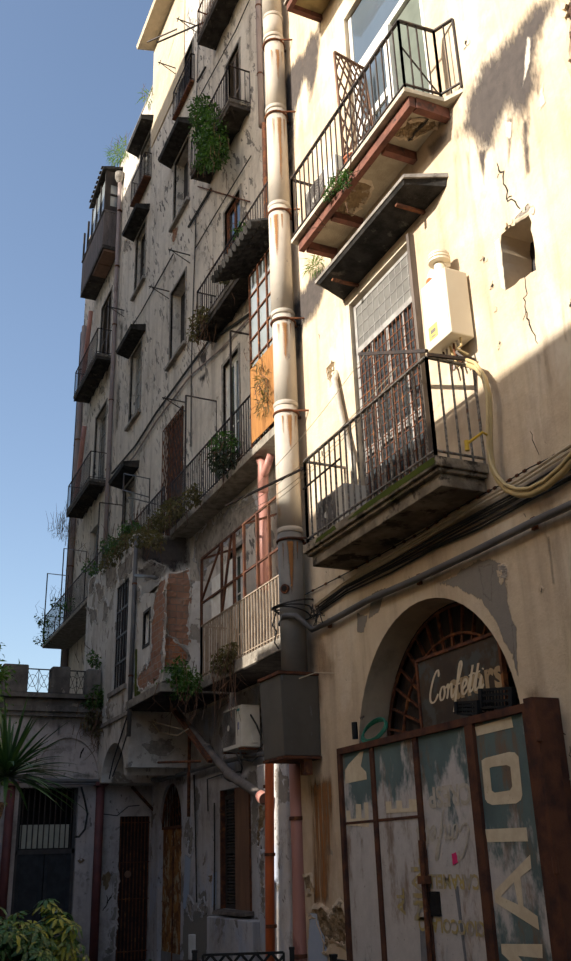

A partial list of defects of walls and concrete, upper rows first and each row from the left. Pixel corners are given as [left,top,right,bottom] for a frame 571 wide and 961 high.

corrosion [272,117,285,172]
spalling [394,118,439,142]
crack [497,163,520,209]
corrosion [270,214,283,250]
spalling [479,202,535,290]
corrosion [277,322,291,357]
corrosion [282,414,296,446]
peeling [117,490,258,692]
corrosion [311,778,332,902]
spalling [302,872,346,960]